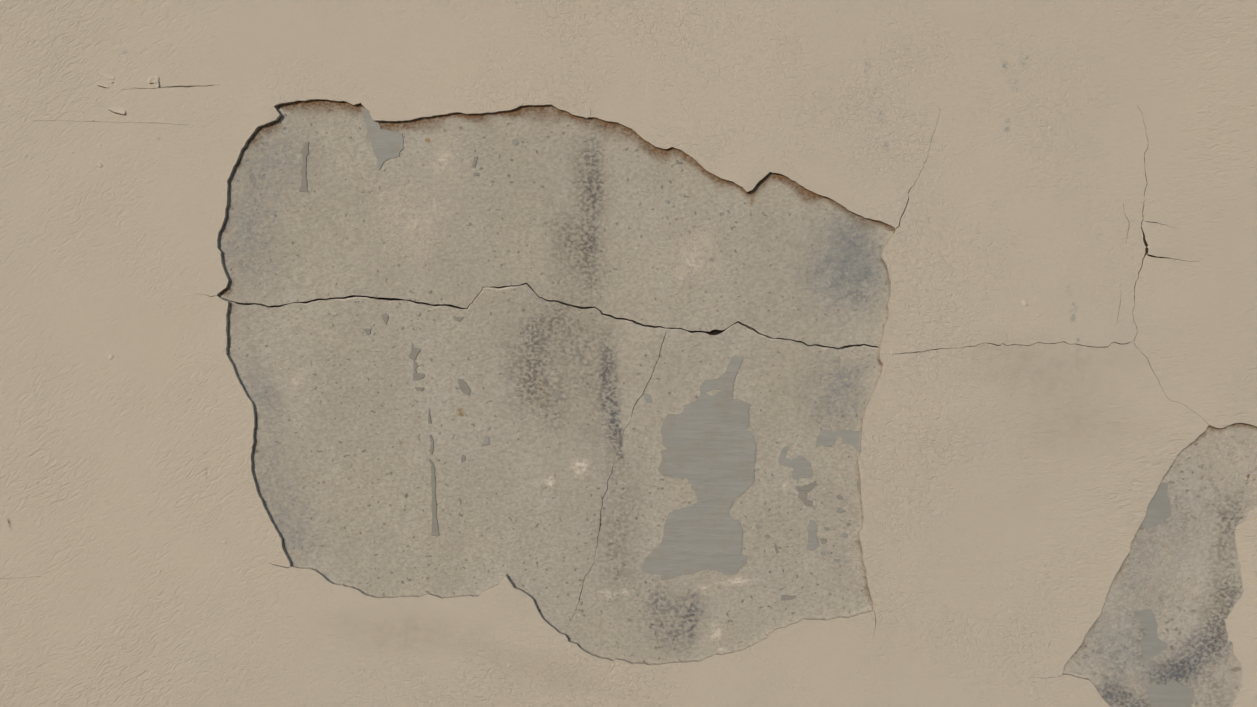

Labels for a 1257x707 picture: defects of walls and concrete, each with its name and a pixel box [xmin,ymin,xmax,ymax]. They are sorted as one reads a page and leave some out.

peeling [217,99,896,665]
crack [203,108,1208,631]
peeling [1062,423,1257,707]